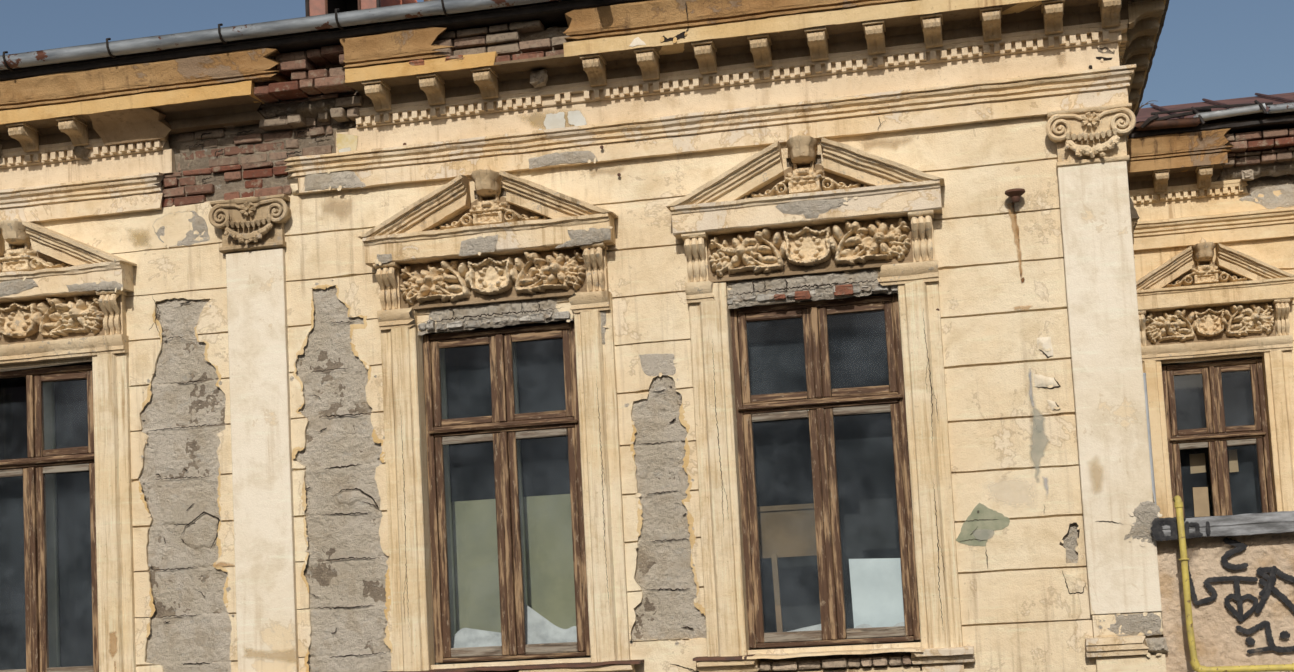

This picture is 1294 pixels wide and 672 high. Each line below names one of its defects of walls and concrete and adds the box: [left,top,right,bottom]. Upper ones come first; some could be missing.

flaking render [153,44,366,249]
corrosion [1007,202,1025,282]
spalling [139,296,234,672]
spalling [290,280,393,672]
spalling [624,360,707,646]
damp [1029,373,1048,489]
spalling [1059,522,1081,563]
spalling [1124,495,1162,547]